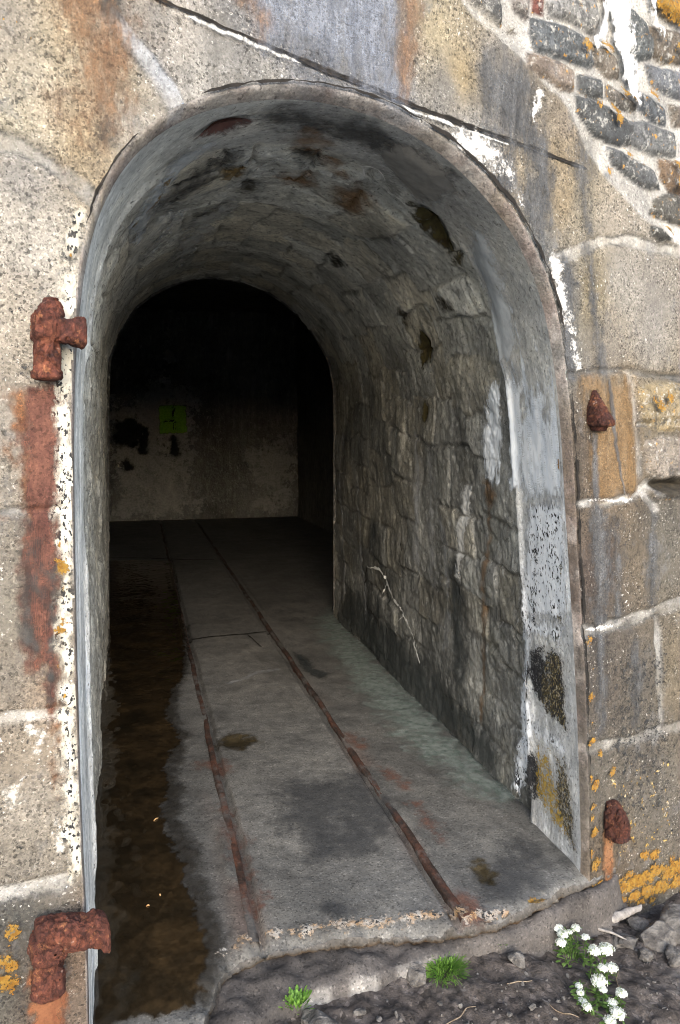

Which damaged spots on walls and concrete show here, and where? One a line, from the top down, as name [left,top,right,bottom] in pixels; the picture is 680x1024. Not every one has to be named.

water stain [188,16,299,63]
crack [86,133,138,223]
crack [158,0,587,342]
spalling [405,201,462,265]
water stain [403,52,581,381]
water stain [584,246,632,730]
rust [585,379,636,496]
rust [12,383,67,728]
rust [28,992,68,1024]